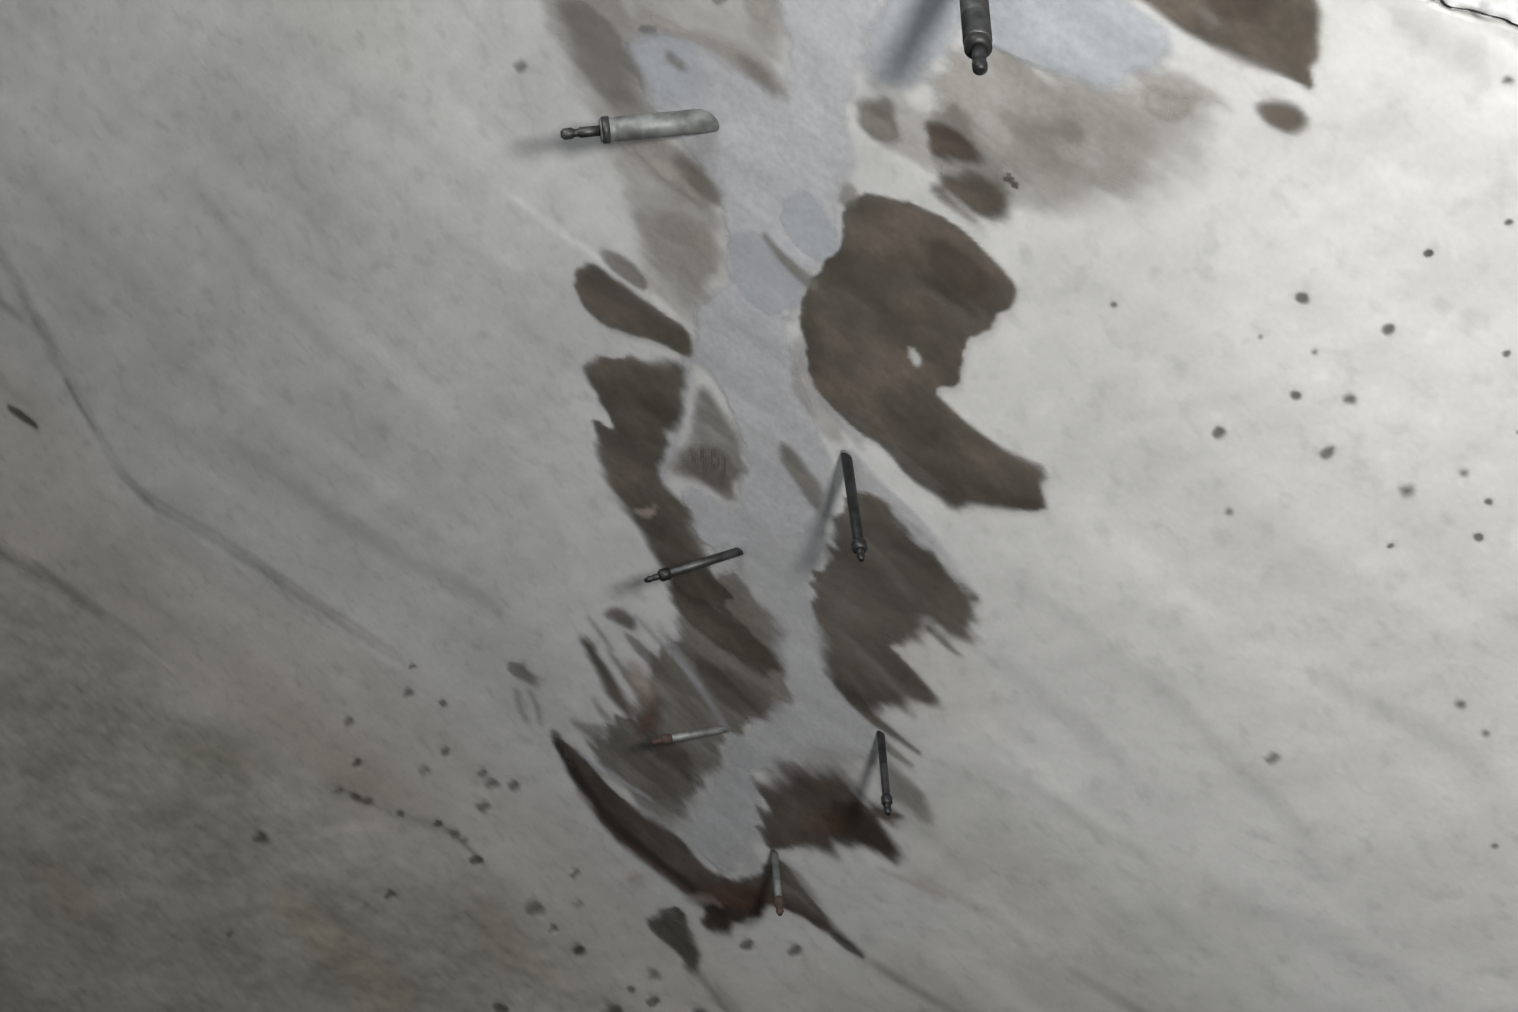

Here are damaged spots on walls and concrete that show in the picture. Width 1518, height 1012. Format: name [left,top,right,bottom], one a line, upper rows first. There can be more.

leakage [553,0,1319,968]